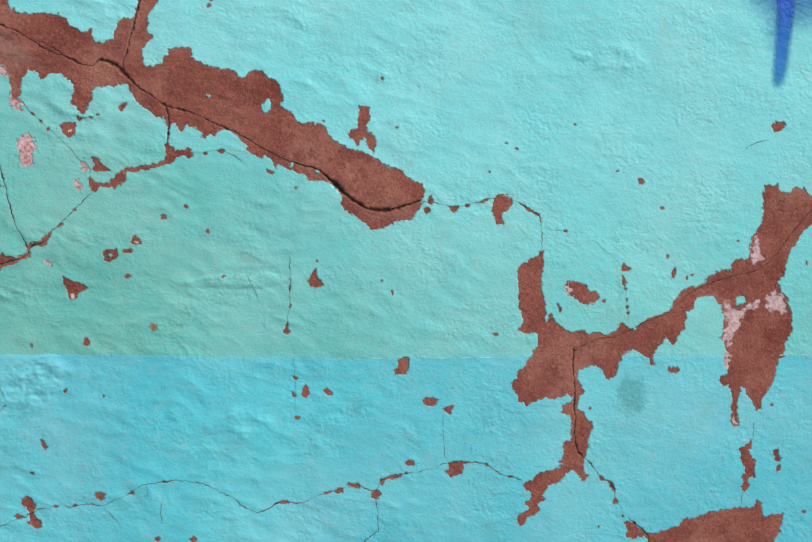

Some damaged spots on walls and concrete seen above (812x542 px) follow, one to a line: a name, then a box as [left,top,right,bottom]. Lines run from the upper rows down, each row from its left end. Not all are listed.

peeling [0,0,425,230]
crack [0,0,558,245]
peeling [771,121,785,132]
crack [0,166,92,270]
peeling [491,194,513,225]
peeling [62,276,87,299]
crack [283,256,296,406]
peeling [512,184,812,526]
crack [572,209,812,540]
crack [0,436,521,542]
peeling [624,500,783,542]